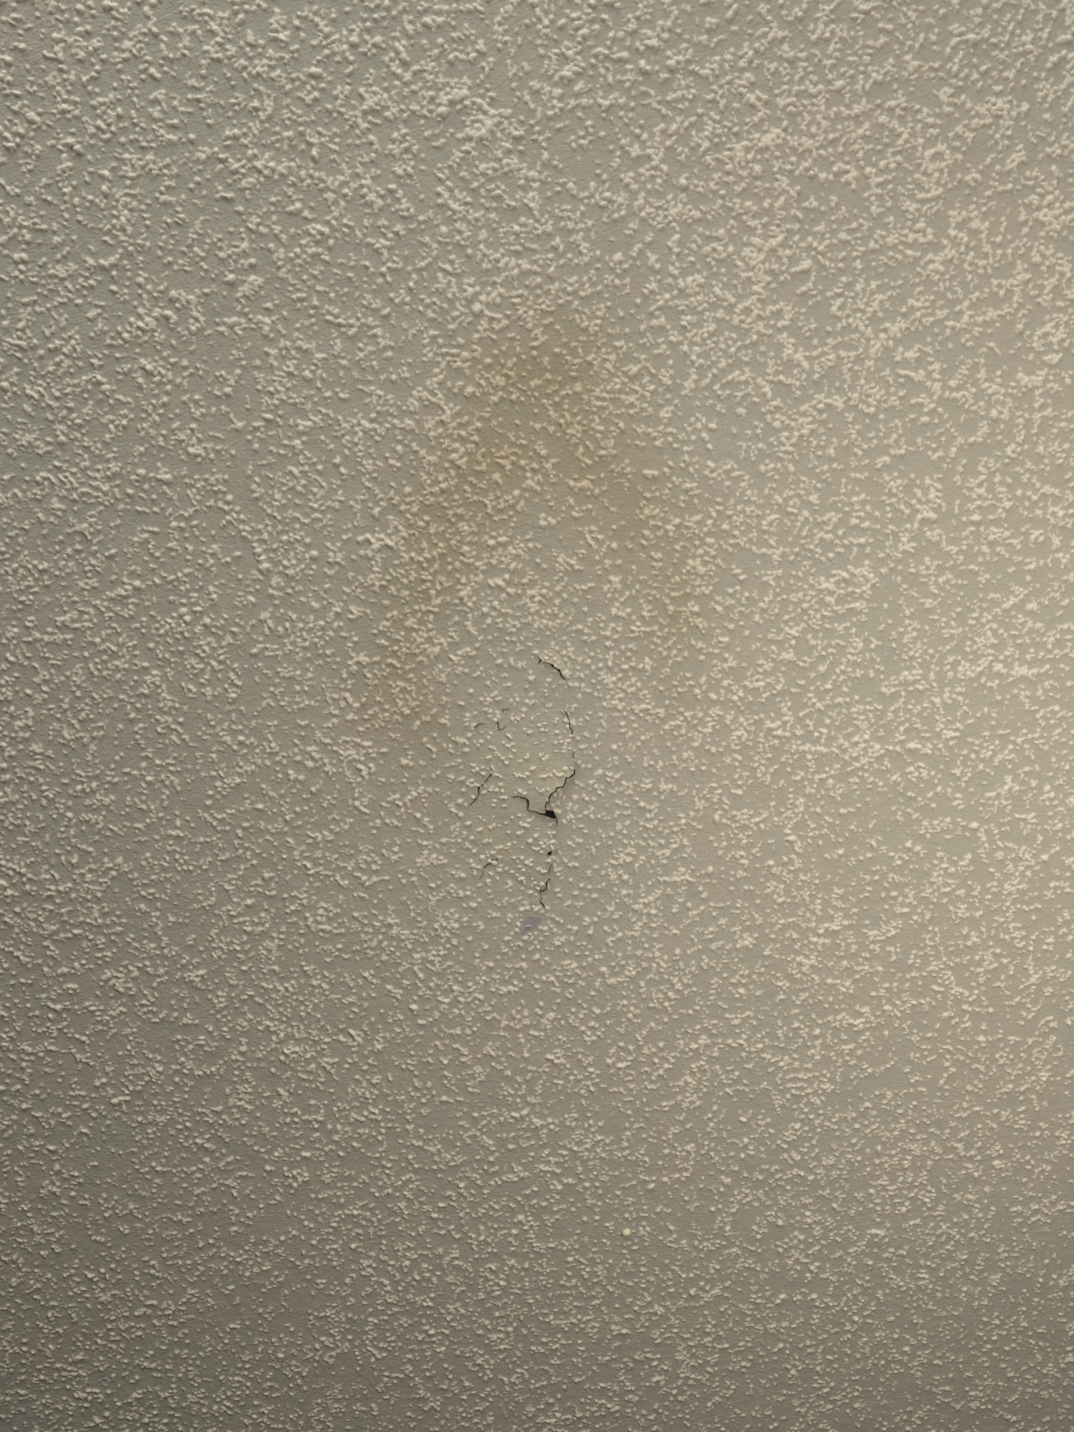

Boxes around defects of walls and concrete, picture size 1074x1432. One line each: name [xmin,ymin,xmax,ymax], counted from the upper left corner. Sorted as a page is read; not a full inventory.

peeling [538,645,570,680]